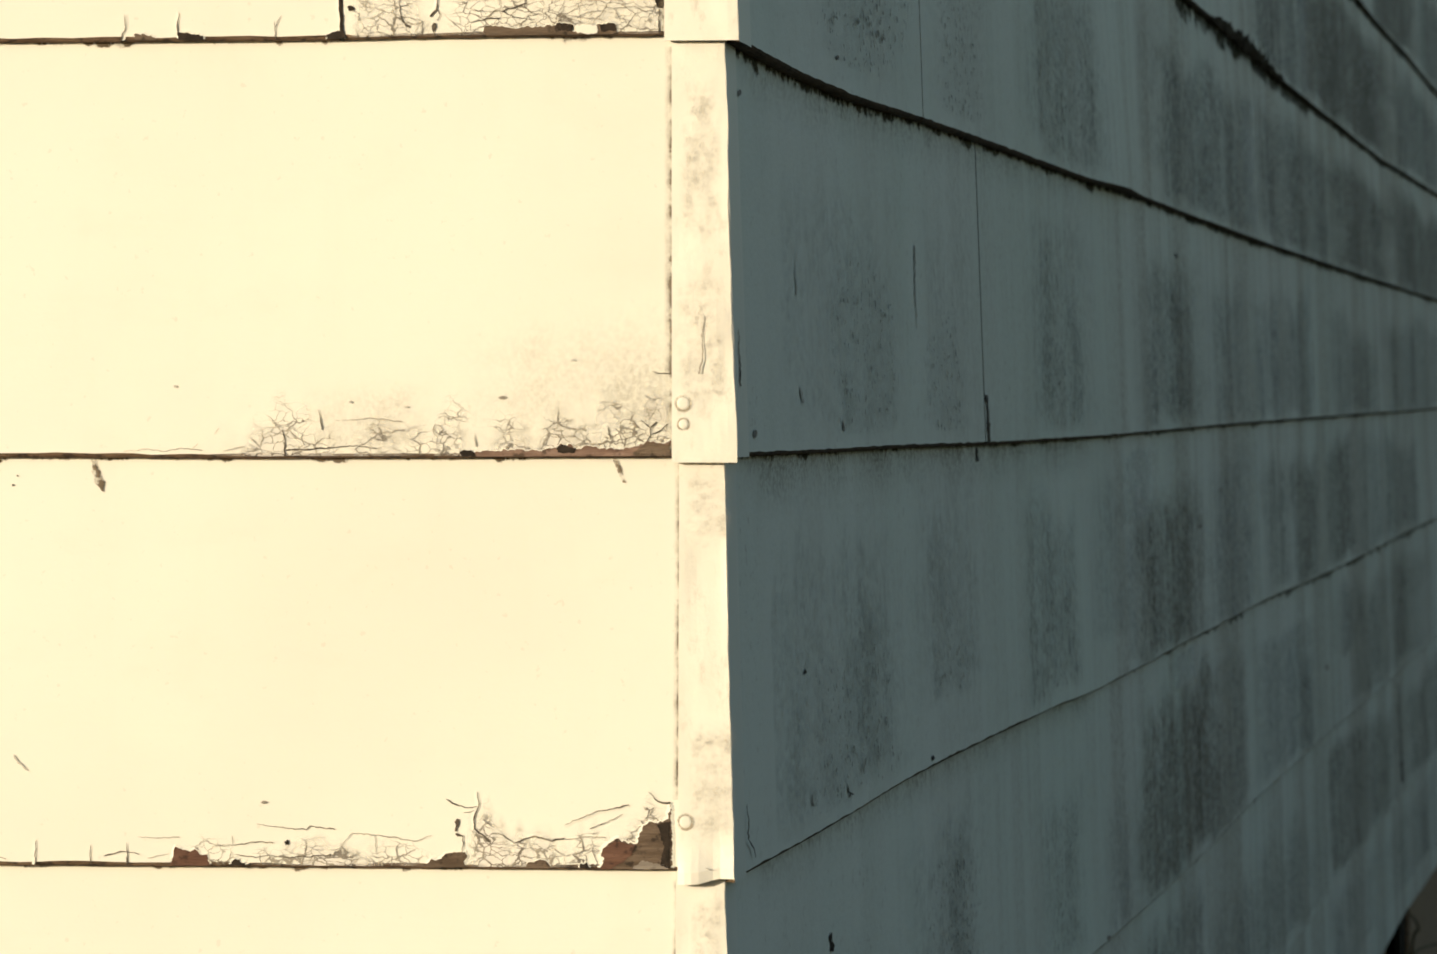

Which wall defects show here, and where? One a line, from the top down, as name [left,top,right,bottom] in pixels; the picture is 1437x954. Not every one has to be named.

peeling [482,21,619,35]
peeling [459,439,672,457]
leakage [1134,445,1433,671]
peeling [578,802,676,869]
peeling [170,845,212,866]
peeling [229,857,256,866]
peeling [426,850,469,868]
peeling [526,858,551,868]